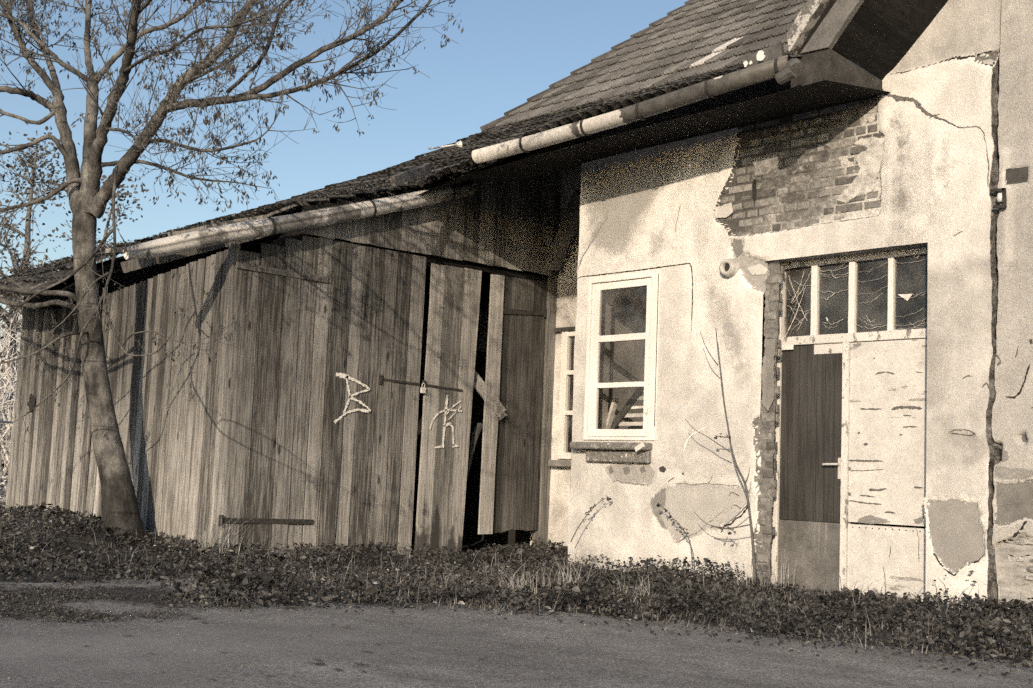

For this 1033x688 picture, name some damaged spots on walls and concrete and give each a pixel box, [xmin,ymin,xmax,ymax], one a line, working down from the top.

flaking render [606,463,655,486]
flaking render [713,95,885,585]
peeling [848,488,895,524]
peeling [860,406,923,435]
crack [882,6,1033,605]
flaking render [914,443,1033,612]